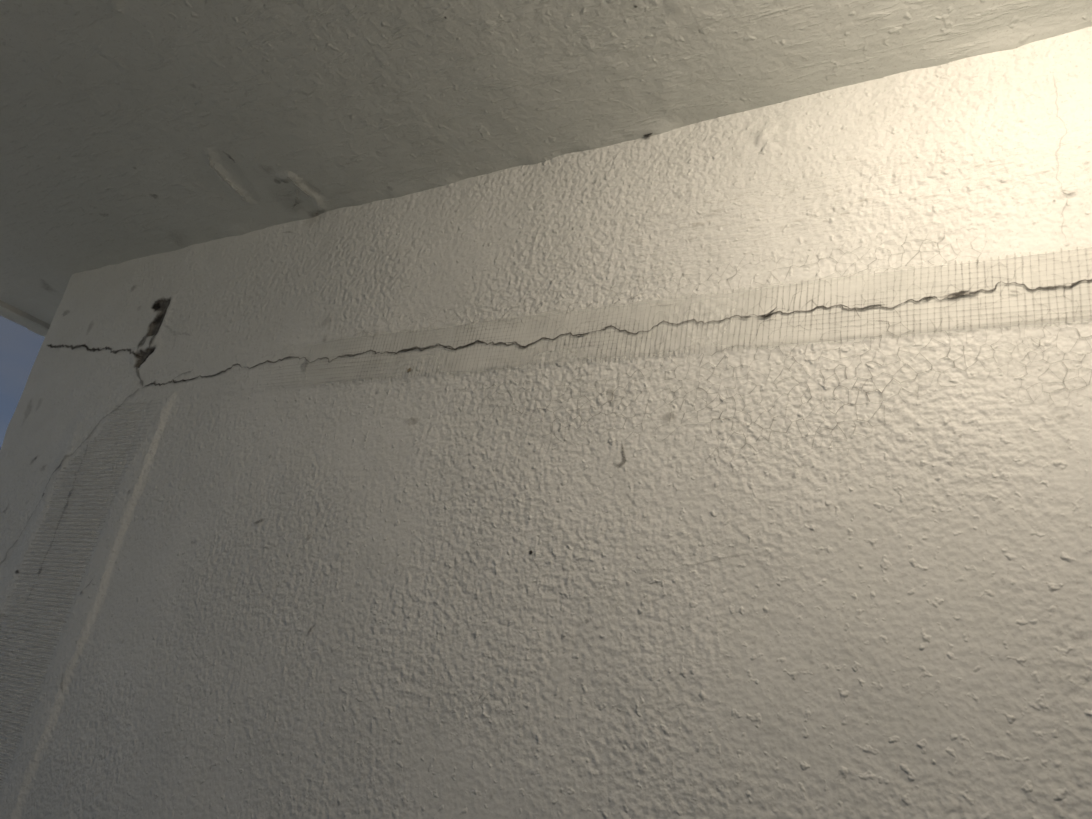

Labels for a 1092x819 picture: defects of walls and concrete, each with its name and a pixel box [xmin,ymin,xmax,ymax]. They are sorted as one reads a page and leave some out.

crack [48,344,140,357]
flaking render [135,298,171,368]
crack [144,279,1092,387]